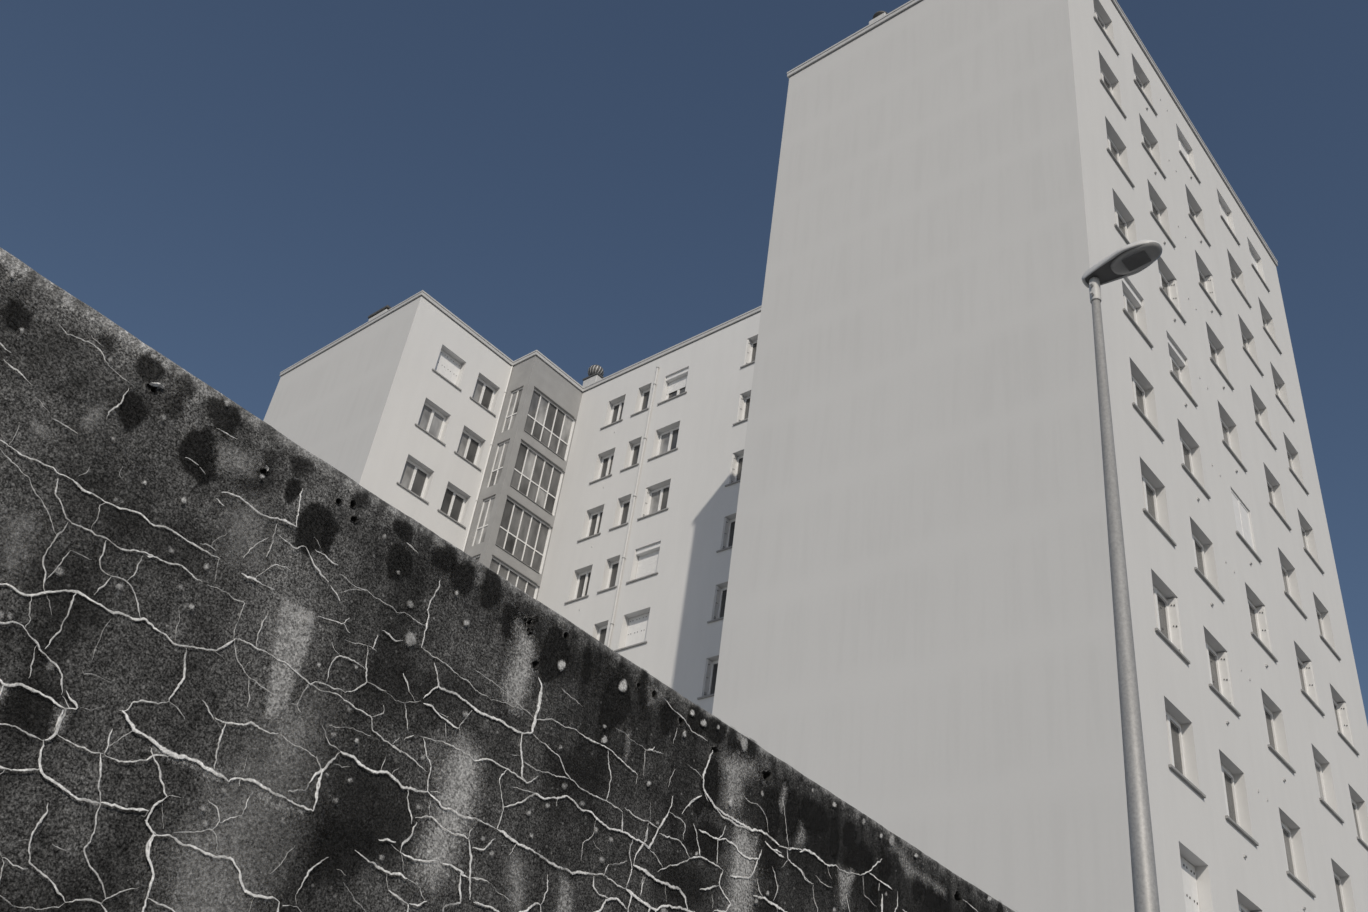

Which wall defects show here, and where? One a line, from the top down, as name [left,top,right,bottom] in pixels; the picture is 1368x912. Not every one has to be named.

crack [0,343,78,434]
crack [61,327,129,416]
water stain [136,354,164,381]
water stain [177,398,240,484]
water stain [284,456,339,556]
water stain [387,519,413,580]
water stain [265,599,315,719]
crack [0,430,906,912]
water stain [432,545,592,715]
water stain [313,734,484,889]
water stain [553,756,598,796]
water stain [599,670,891,912]